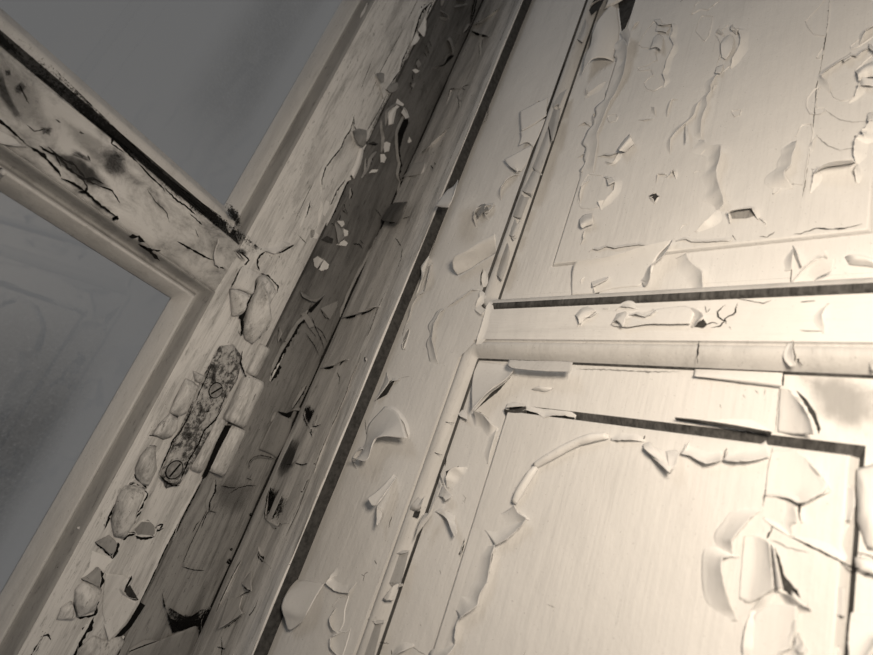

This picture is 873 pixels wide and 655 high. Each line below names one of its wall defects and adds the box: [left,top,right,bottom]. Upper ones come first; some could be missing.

crack [13,48,55,103]
crack [0,119,213,261]
leakage [0,33,258,252]
peeling [231,73,409,336]
peeling [571,0,773,295]
peeling [764,112,873,196]
peeling [81,510,164,641]
spalling [203,425,232,479]
peeling [281,567,357,655]
peeling [351,372,410,527]
peeling [364,359,831,655]
peeling [836,586,873,655]